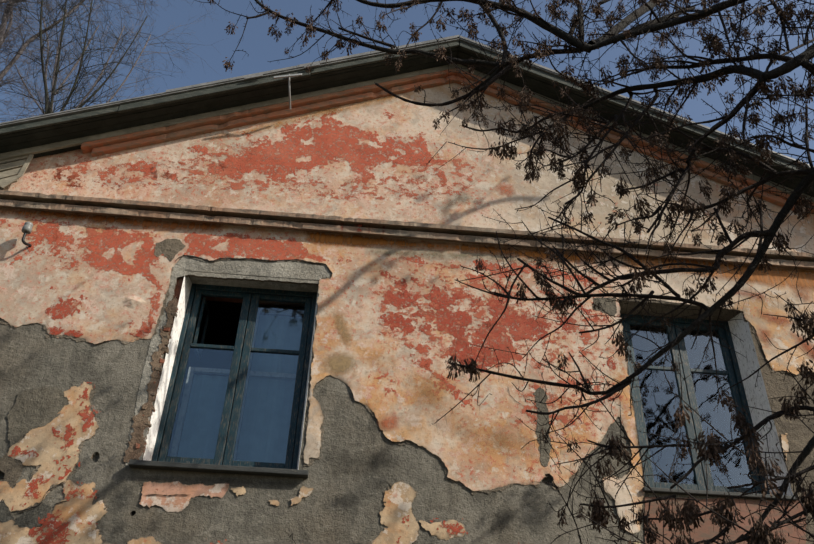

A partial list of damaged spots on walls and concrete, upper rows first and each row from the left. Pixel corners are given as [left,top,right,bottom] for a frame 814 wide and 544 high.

peeling [52,111,474,203]
spalling [0,216,814,544]